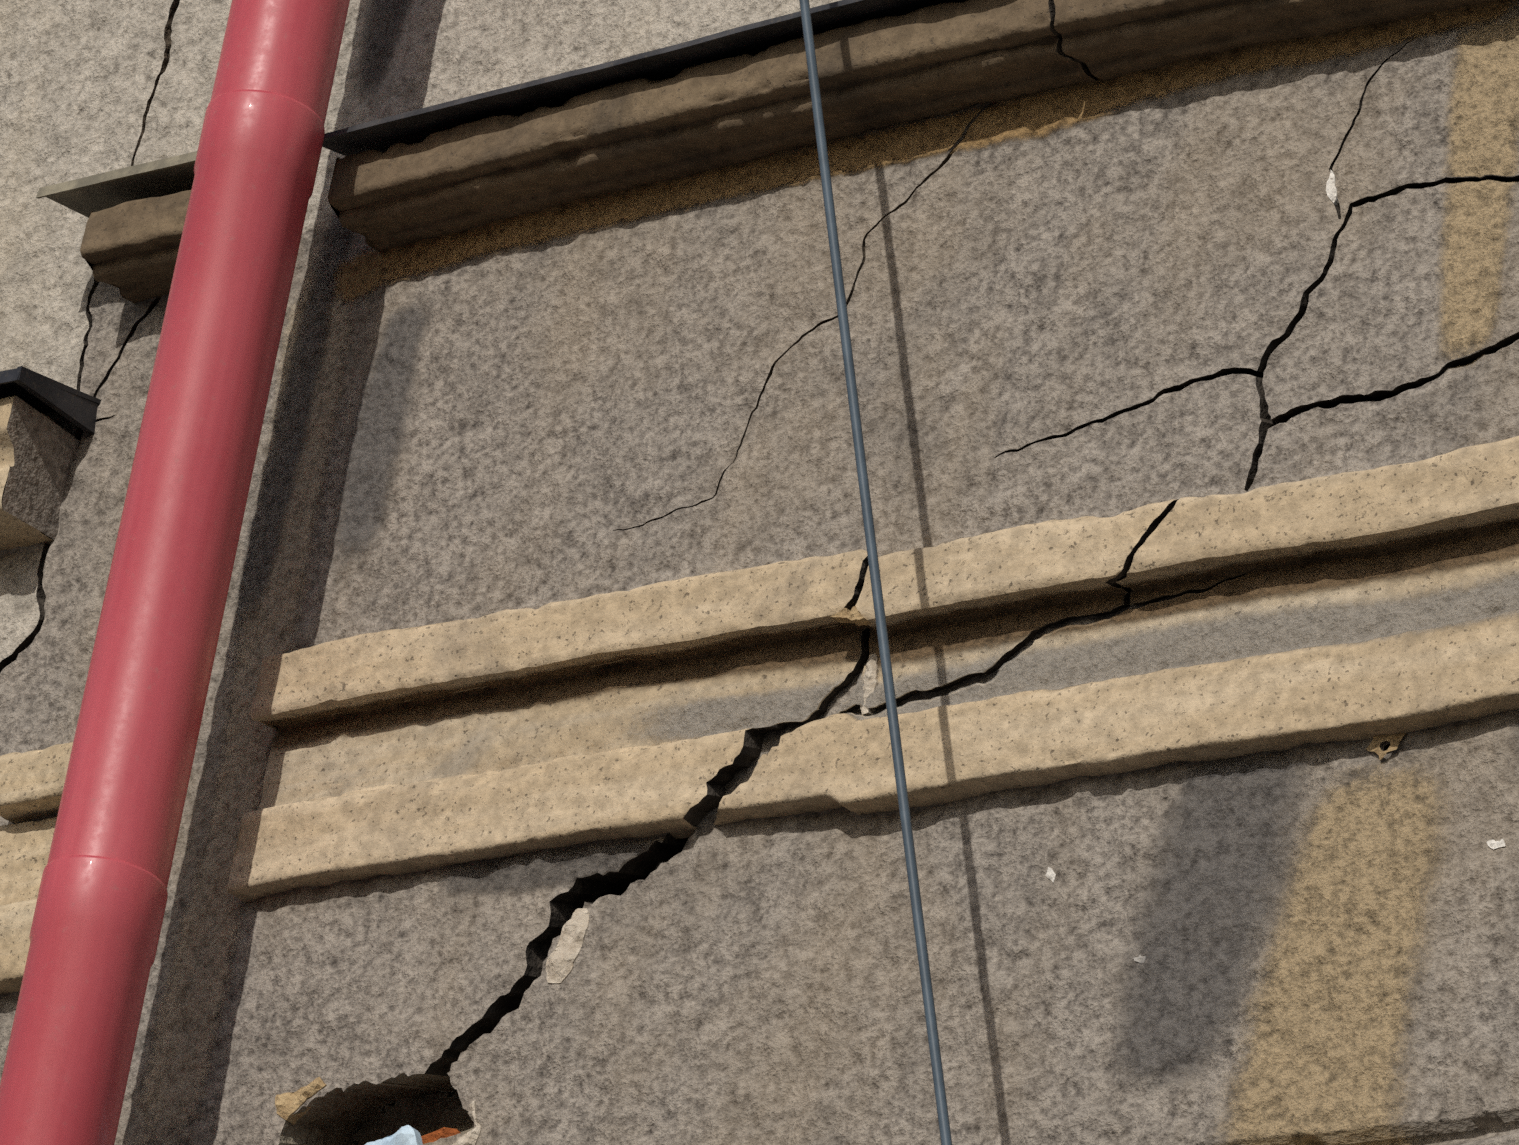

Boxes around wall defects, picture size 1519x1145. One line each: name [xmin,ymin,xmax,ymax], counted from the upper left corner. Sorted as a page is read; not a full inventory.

crack [131,0,180,166]
crack [1048,0,1097,81]
crack [74,279,160,441]
crack [613,103,992,531]
crack [994,36,1519,491]
crack [0,536,52,673]
leakage [143,280,1519,1145]
crack [424,499,1246,1076]
hole [275,1073,481,1145]